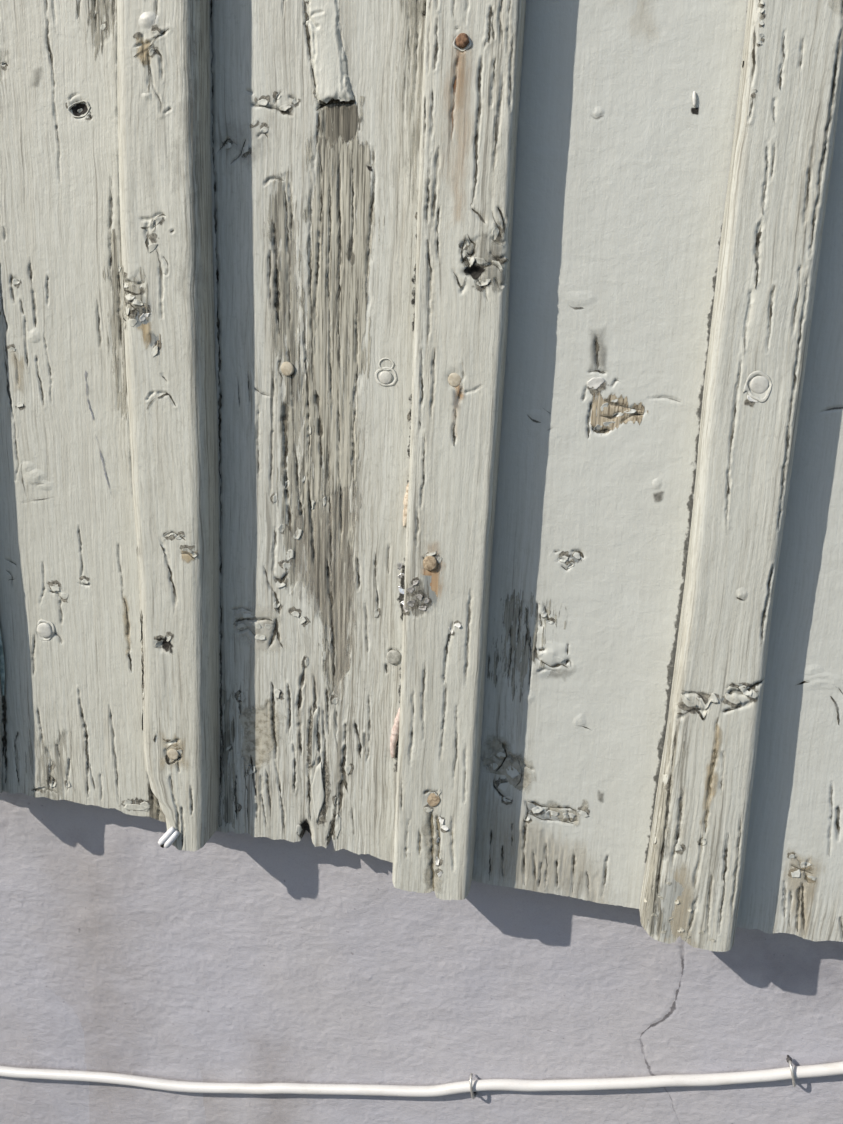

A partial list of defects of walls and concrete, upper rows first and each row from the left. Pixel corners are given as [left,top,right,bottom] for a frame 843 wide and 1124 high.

peeling [76,0,117,58]
peeling [98,181,161,419]
peeling [141,214,166,252]
peeling [234,0,384,702]
peeling [463,239,504,286]
peeling [582,337,648,437]
rust [424,563,440,596]
peeling [487,589,566,703]
peeling [218,680,284,828]
peeling [283,703,330,835]
peeling [483,739,590,825]
peeling [641,678,765,941]